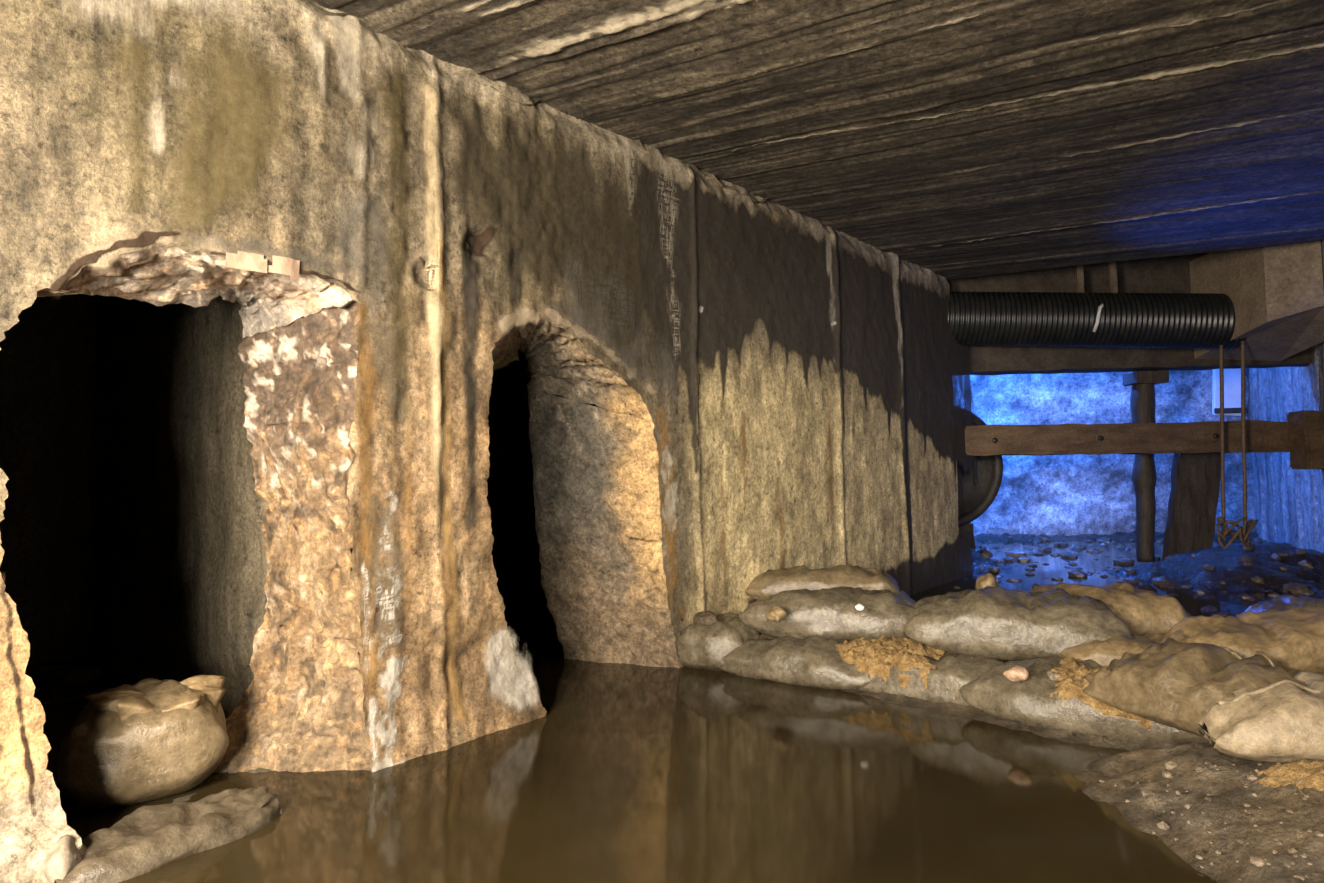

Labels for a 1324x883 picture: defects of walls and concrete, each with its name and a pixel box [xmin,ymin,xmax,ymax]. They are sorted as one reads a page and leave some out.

spalling [50,229,178,290]
damp [180,45,280,220]
damp [390,77,407,277]
damp [732,44,1324,152]
damp [394,299,408,413]
damp [423,84,456,619]
damp [456,106,979,596]
crack [0,577,35,816]
efflorescence [361,564,404,772]
damp [447,649,464,720]
efflorescence [487,630,537,709]